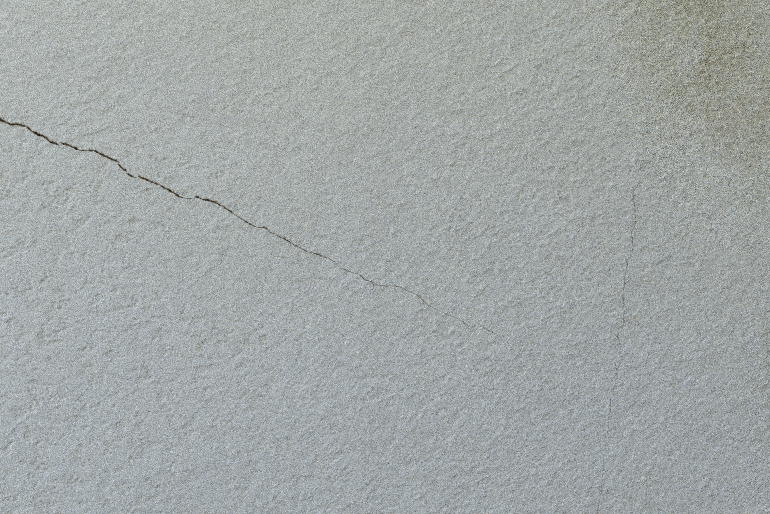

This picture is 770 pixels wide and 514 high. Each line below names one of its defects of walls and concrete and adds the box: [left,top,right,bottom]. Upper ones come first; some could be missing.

crack [0,115,510,340]